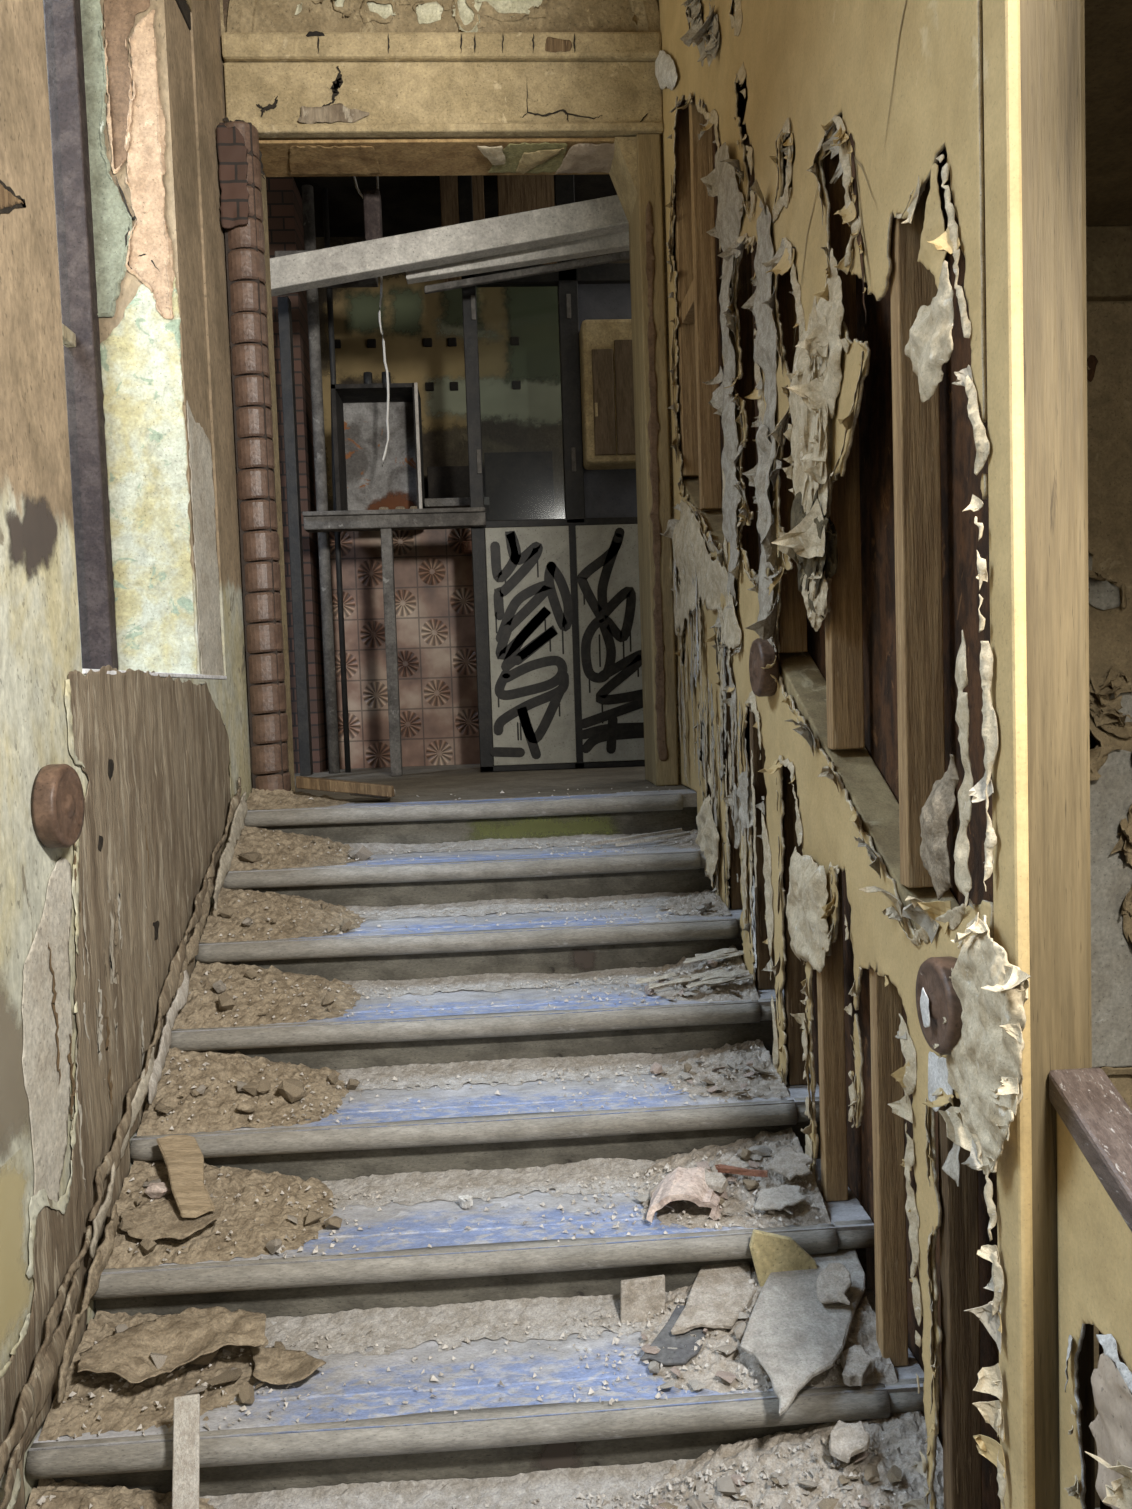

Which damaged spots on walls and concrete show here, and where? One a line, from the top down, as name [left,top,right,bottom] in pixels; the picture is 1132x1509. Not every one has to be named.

peeling [295,0,549,32]
crack [460,34,534,53]
crack [522,89,602,121]
peeling [80,0,175,320]
peeling [952,365,973,388]
peeling [962,495,984,512]
peeling [1088,550,1127,610]
peeling [1089,665,1132,1076]
peeling [920,988,930,1027]
peeling [0,665,233,1509]
peeling [888,1062,983,1171]
peeling [1085,1451,1132,1509]